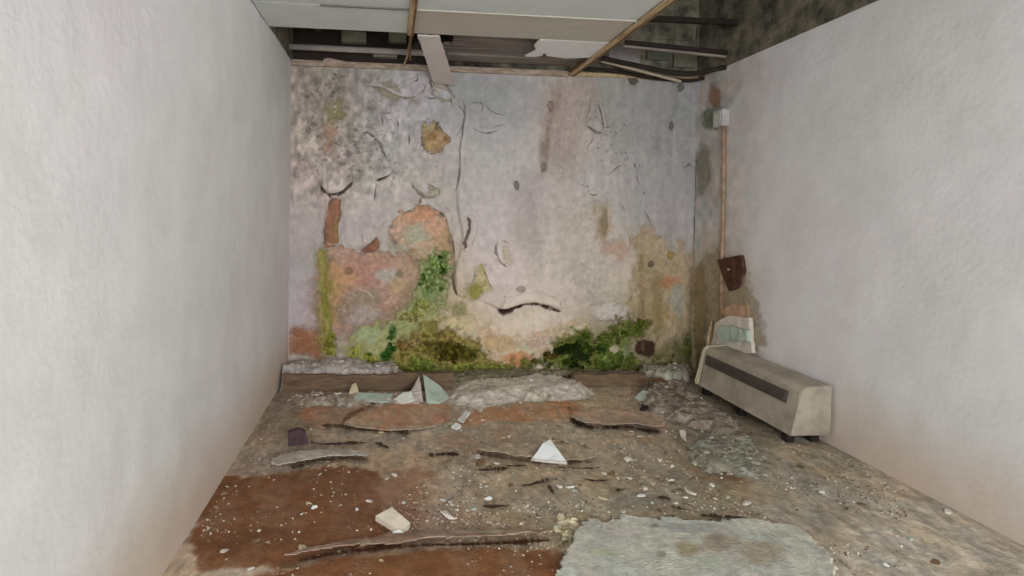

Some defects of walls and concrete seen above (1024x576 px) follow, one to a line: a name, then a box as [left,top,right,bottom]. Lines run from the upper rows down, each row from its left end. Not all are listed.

flaking render [297,73,505,338]
crack [320,75,562,315]